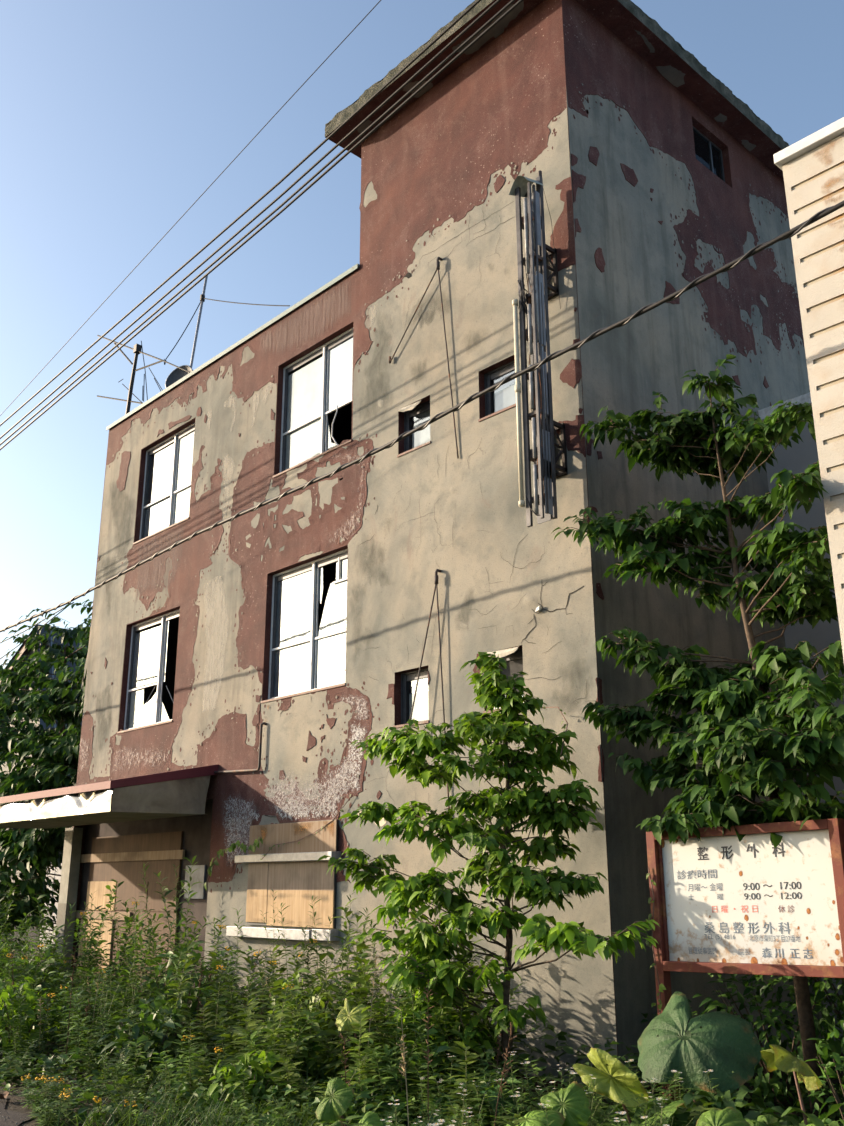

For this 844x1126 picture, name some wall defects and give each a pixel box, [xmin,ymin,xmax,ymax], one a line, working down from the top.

peeling [81,83,810,1085]
crack [476,535,584,651]
damp [265,697,367,819]
damp [222,794,260,866]